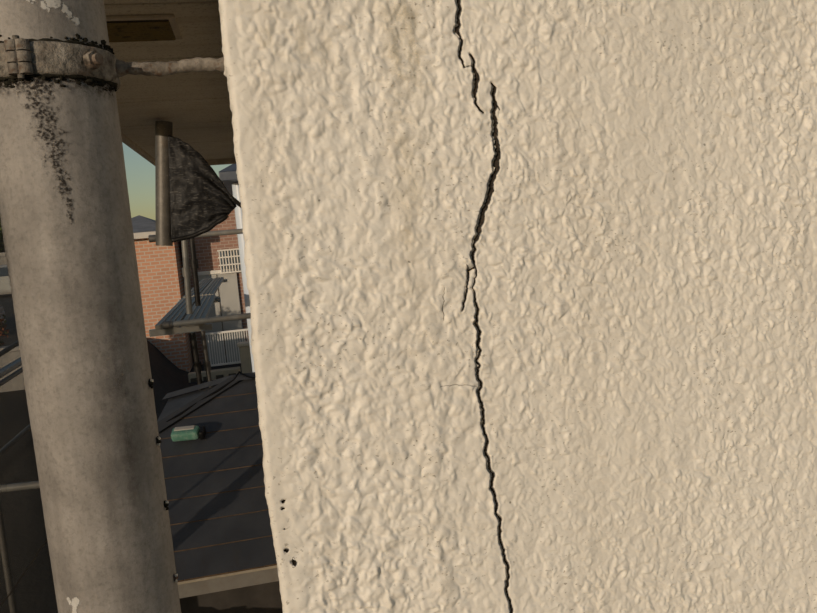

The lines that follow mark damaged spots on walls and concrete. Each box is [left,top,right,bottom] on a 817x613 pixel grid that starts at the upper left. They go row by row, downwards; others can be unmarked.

peeling [26,0,80,25]
mould [0,77,114,222]
crack [441,0,513,613]
peeling [67,597,79,613]